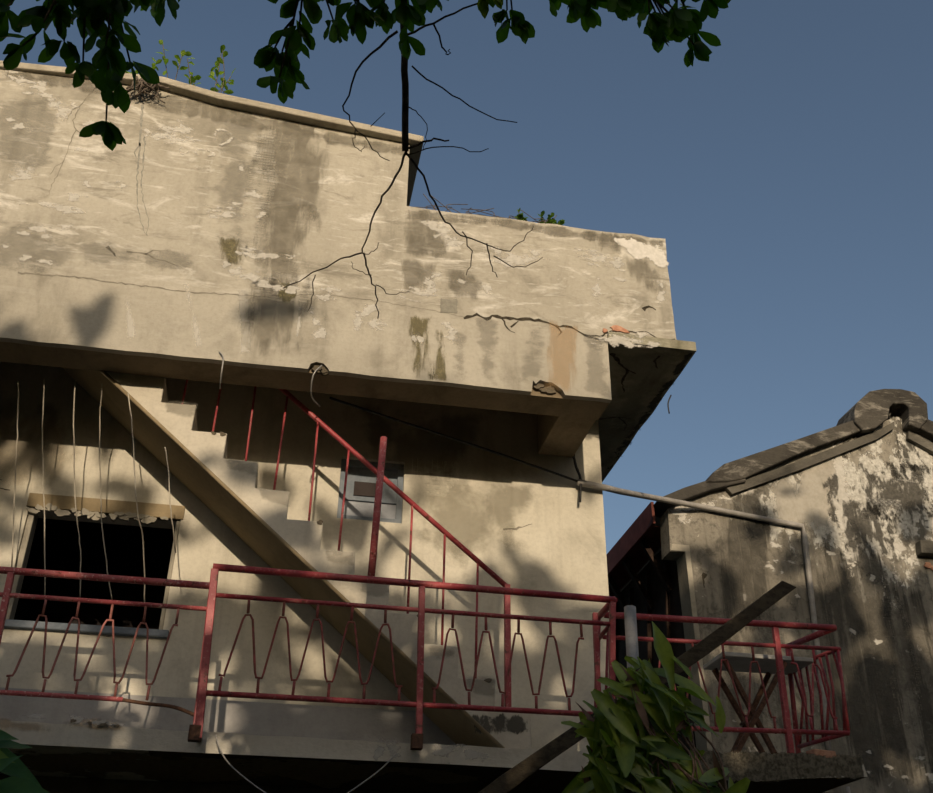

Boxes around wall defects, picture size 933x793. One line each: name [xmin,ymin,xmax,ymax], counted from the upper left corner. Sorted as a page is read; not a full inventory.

leakage [7,72,100,92]
crack [49,92,92,191]
crack [106,105,178,266]
peeling [144,119,202,144]
leakage [129,91,321,348]
leakage [404,211,486,289]
peeling [576,237,669,282]
crack [18,272,675,392]
leakage [432,334,446,380]
spalling [26,503,169,525]
peeling [670,417,933,606]
leakage [818,438,933,785]